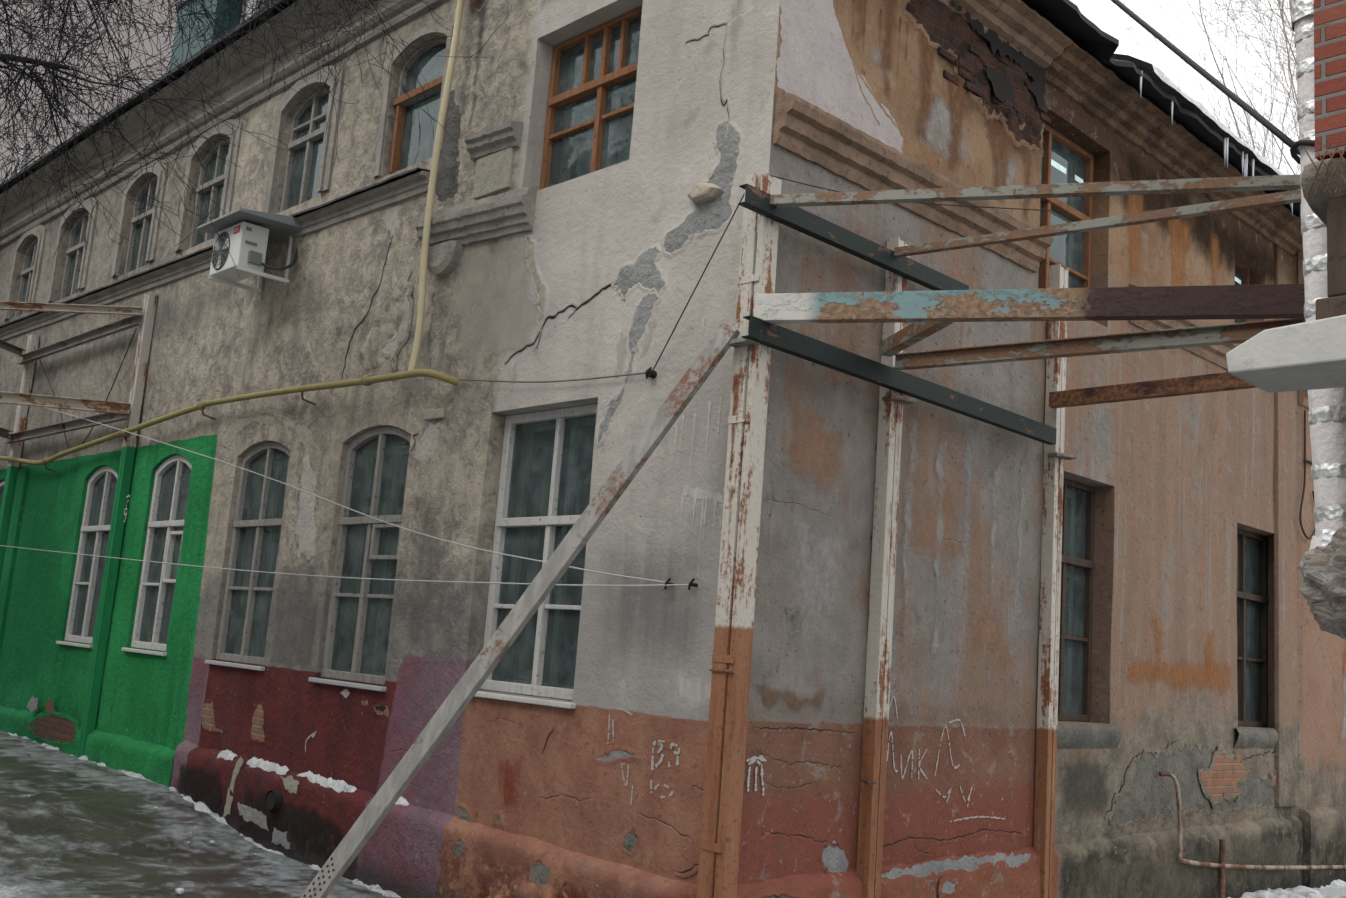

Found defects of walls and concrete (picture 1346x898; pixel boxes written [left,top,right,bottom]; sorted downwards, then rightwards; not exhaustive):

crack [685,6,755,138]
flaking render [901,0,1051,156]
crack [504,281,617,364]
flaking render [595,117,745,449]
rust [731,374,740,464]
flaking render [27,696,80,748]
flaking render [200,698,225,736]
flaking render [249,699,267,746]
flaking render [223,756,290,849]
flaking render [280,775,299,794]
flaking render [881,852,1031,898]